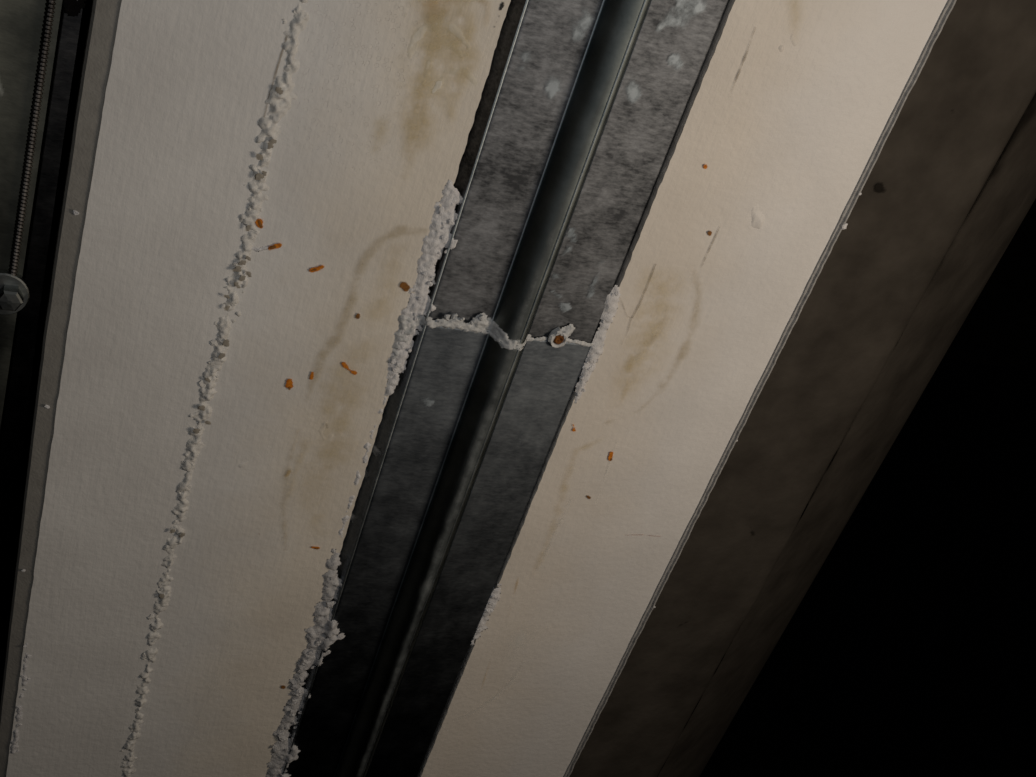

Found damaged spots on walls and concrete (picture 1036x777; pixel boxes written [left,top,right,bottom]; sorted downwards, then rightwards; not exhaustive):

rust [252,243,282,252]